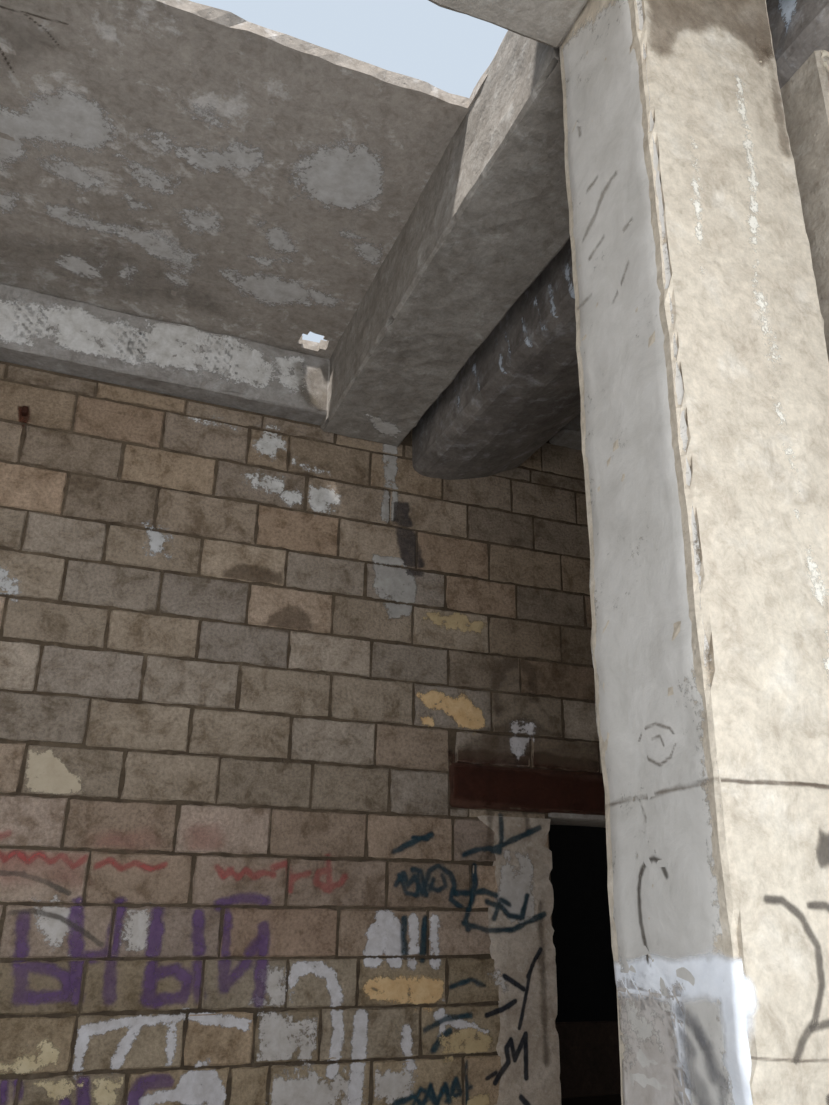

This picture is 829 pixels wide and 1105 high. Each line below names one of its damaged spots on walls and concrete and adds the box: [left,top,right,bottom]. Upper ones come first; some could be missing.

water stain [778,0,797,35]
peeling [0,85,181,210]
peeling [139,128,264,174]
peeling [44,202,201,288]
peeling [174,207,220,236]
water stain [365,414,424,619]
rust [448,750,605,812]